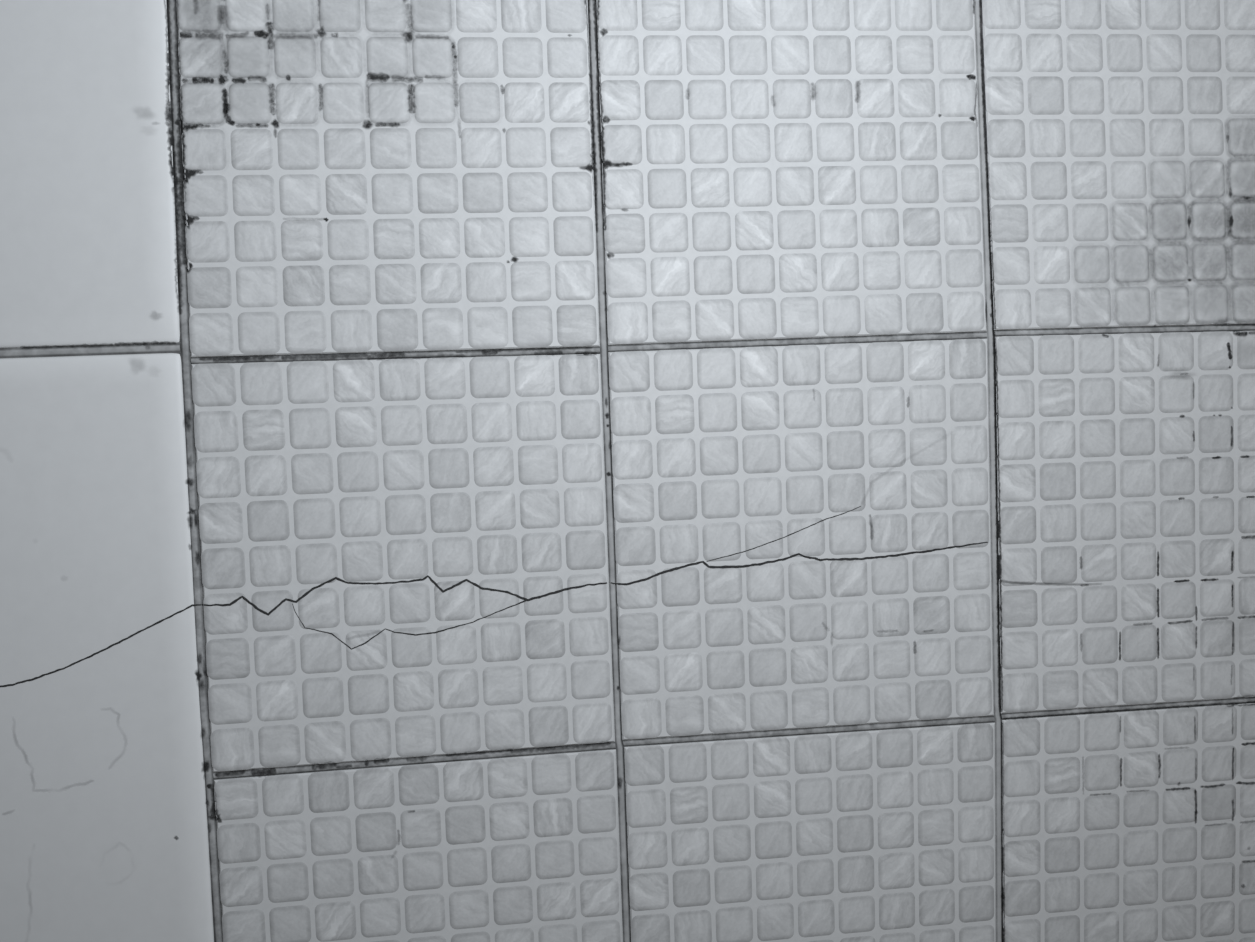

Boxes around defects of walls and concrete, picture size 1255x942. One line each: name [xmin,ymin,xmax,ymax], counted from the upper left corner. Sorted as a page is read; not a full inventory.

crack [0,506,988,687]